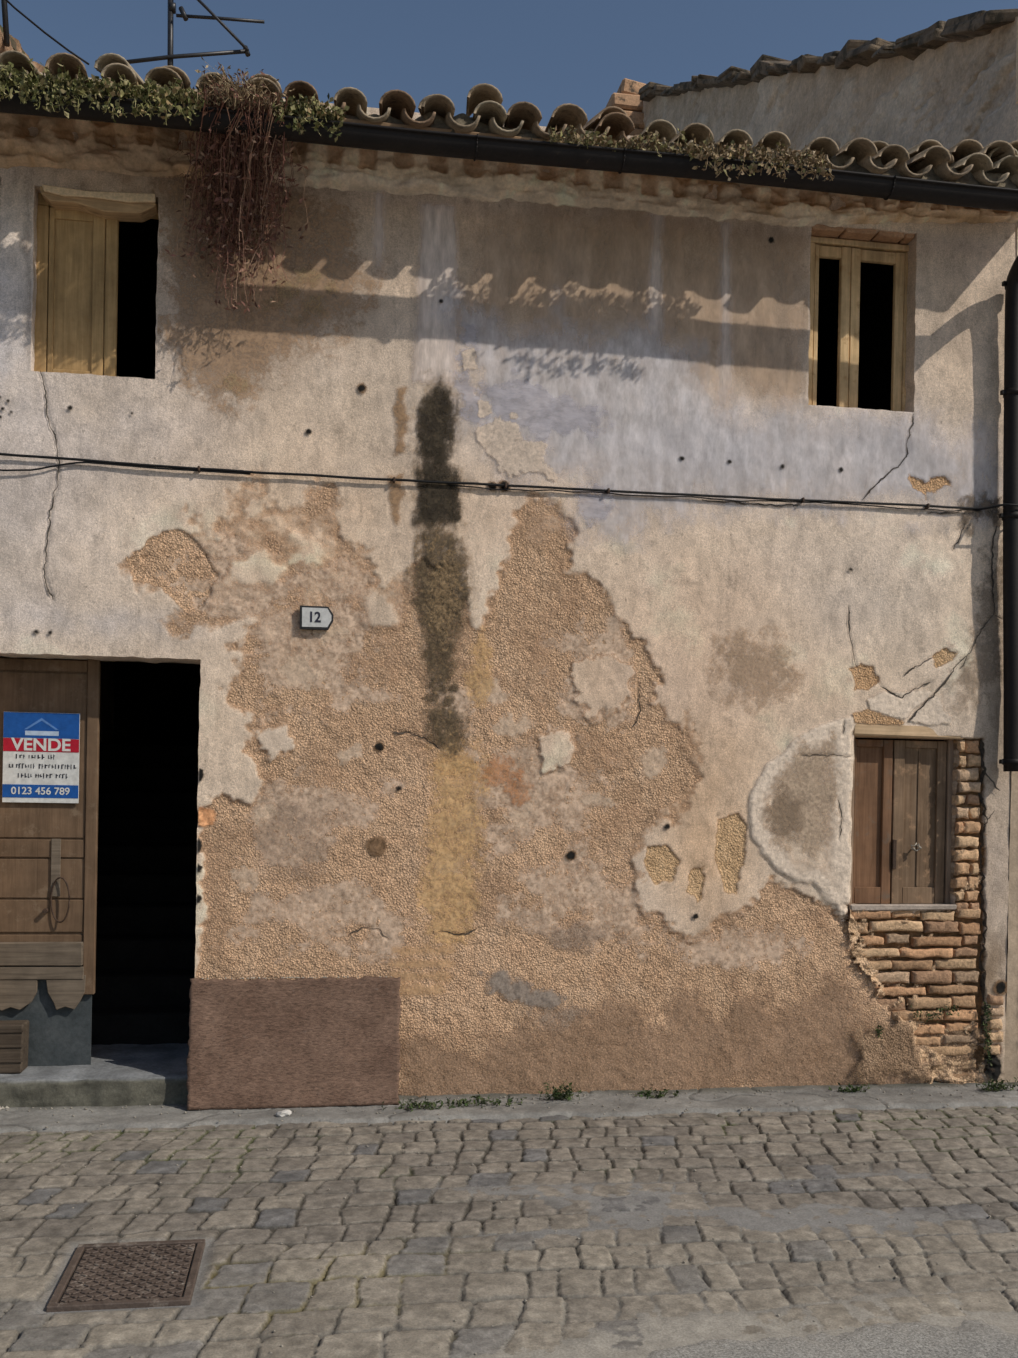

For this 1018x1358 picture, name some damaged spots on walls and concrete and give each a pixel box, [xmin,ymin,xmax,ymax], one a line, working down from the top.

leakage [151,175,381,412]
crack [40,371,60,599]
leakage [388,205,470,755]
peeling [462,316,997,540]
crack [702,499,799,507]
crack [863,414,914,499]
crack [848,607,856,665]
crack [882,511,1002,722]
spalling [121,473,1007,1095]